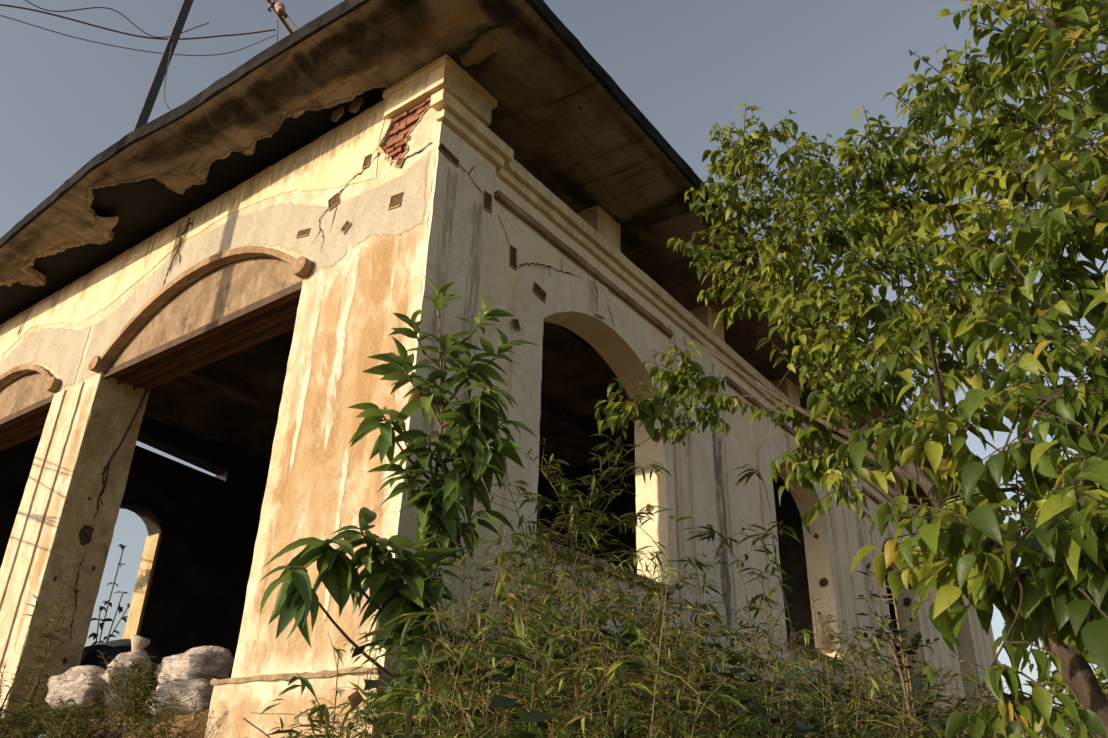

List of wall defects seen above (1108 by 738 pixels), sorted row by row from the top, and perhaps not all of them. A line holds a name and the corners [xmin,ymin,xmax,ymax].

water stain [479,0,539,42]
water stain [139,0,426,162]
crack [311,142,432,252]
peeling [0,83,460,468]
crack [498,215,614,325]
spalling [77,523,97,549]
peeling [334,451,348,549]